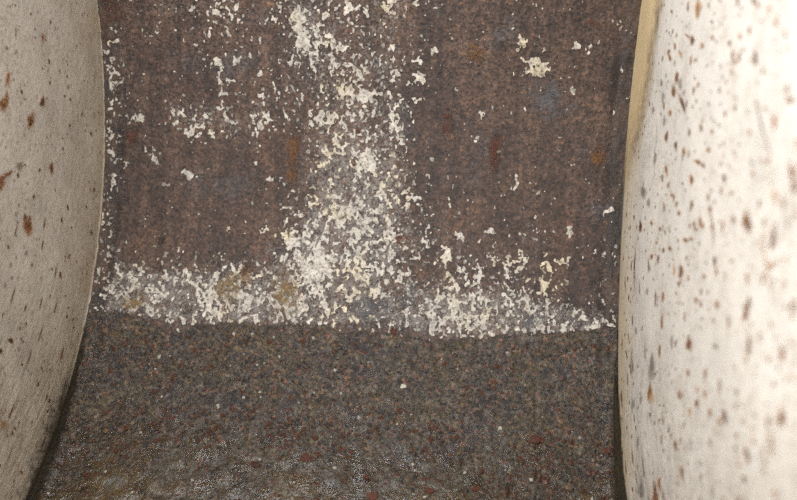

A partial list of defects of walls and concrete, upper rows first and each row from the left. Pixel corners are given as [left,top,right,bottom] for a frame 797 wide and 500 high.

rust [0,71,10,111]
rust [646,0,776,136]
rust [788,160,796,192]
rust [14,214,32,237]
rust [623,142,752,304]
rust [742,297,760,377]
rust [647,365,706,420]
rust [734,397,792,474]